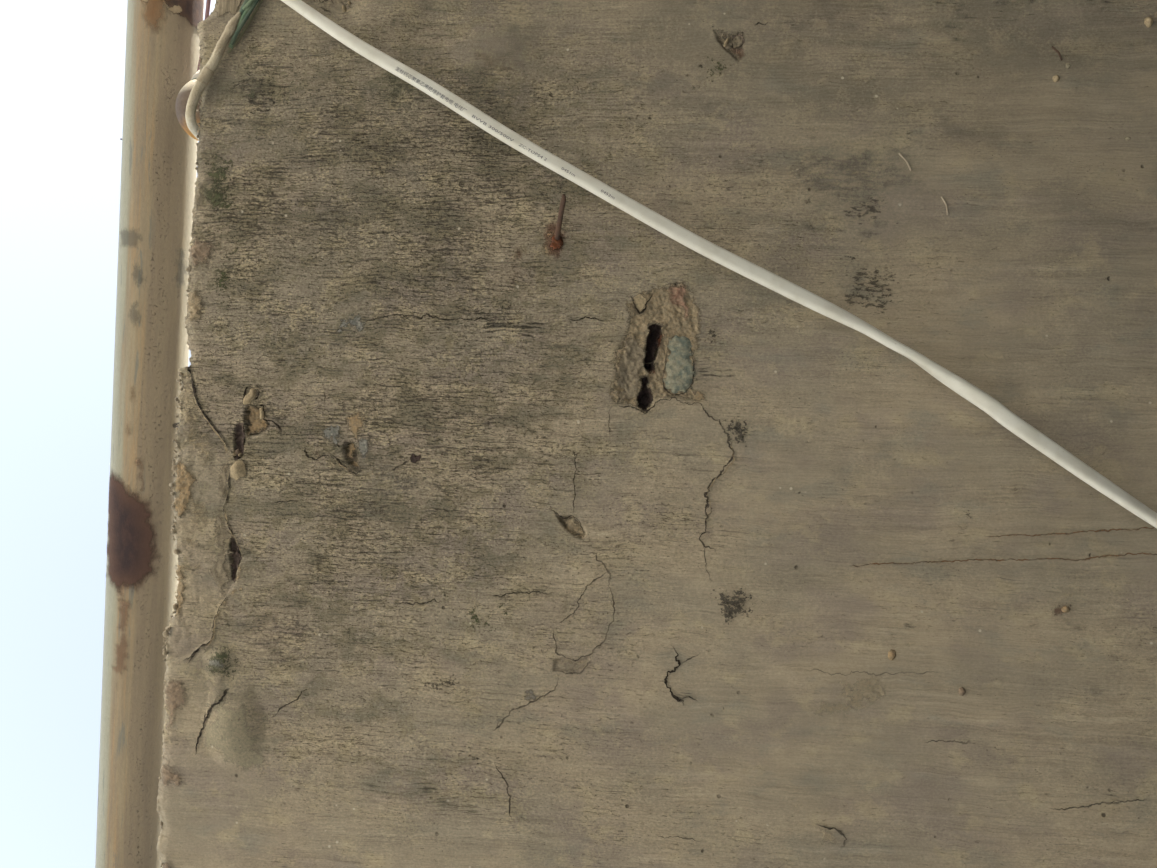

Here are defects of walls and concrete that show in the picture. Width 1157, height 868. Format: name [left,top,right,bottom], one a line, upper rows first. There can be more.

spalling [609,282,704,412]
rust [107,474,156,672]
crack [181,365,242,675]
spalling [230,387,282,480]
crack [569,451,577,508]
crack [608,397,735,572]
crack [853,527,1157,567]
crack [196,689,227,752]
crack [495,553,615,729]
crack [664,650,696,702]
crack [496,768,511,816]